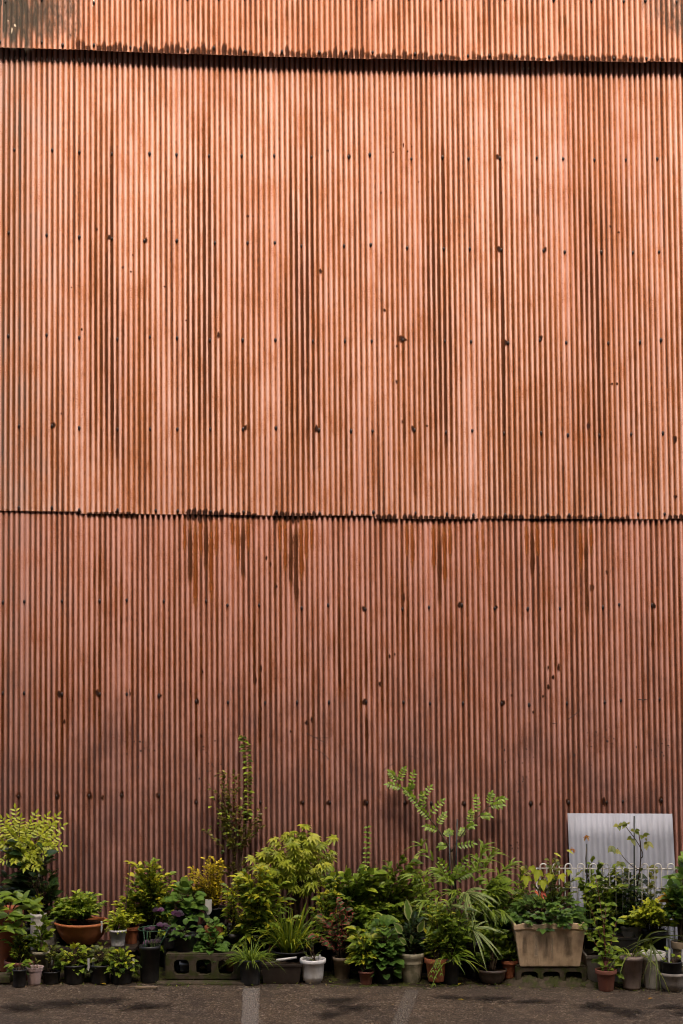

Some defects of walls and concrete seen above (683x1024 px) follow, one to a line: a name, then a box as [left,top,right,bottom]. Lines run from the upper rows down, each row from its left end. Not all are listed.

corrosion [76,3,680,62]
corrosion [183,508,257,760]